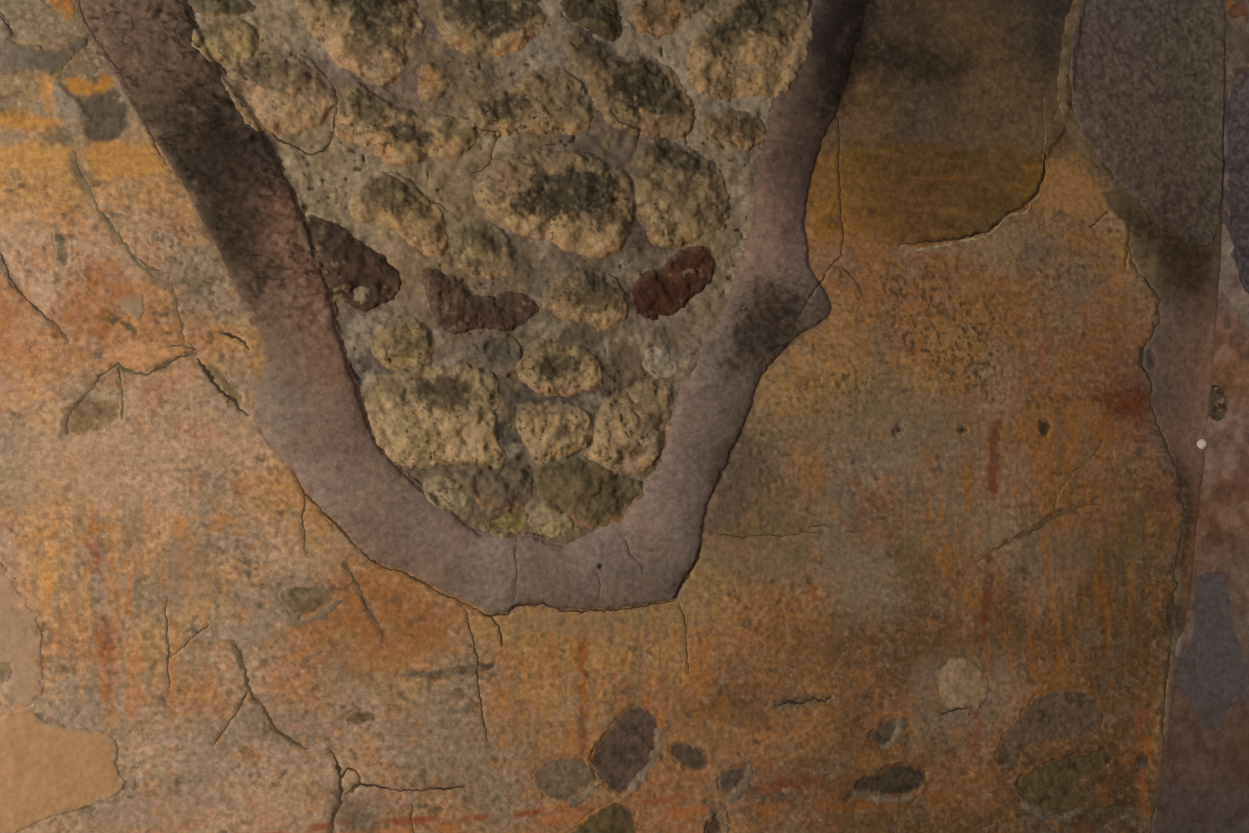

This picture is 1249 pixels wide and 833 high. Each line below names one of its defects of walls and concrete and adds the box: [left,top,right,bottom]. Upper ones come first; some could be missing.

crack [0,253,69,341]
crack [164,596,209,686]
crack [212,644,466,833]